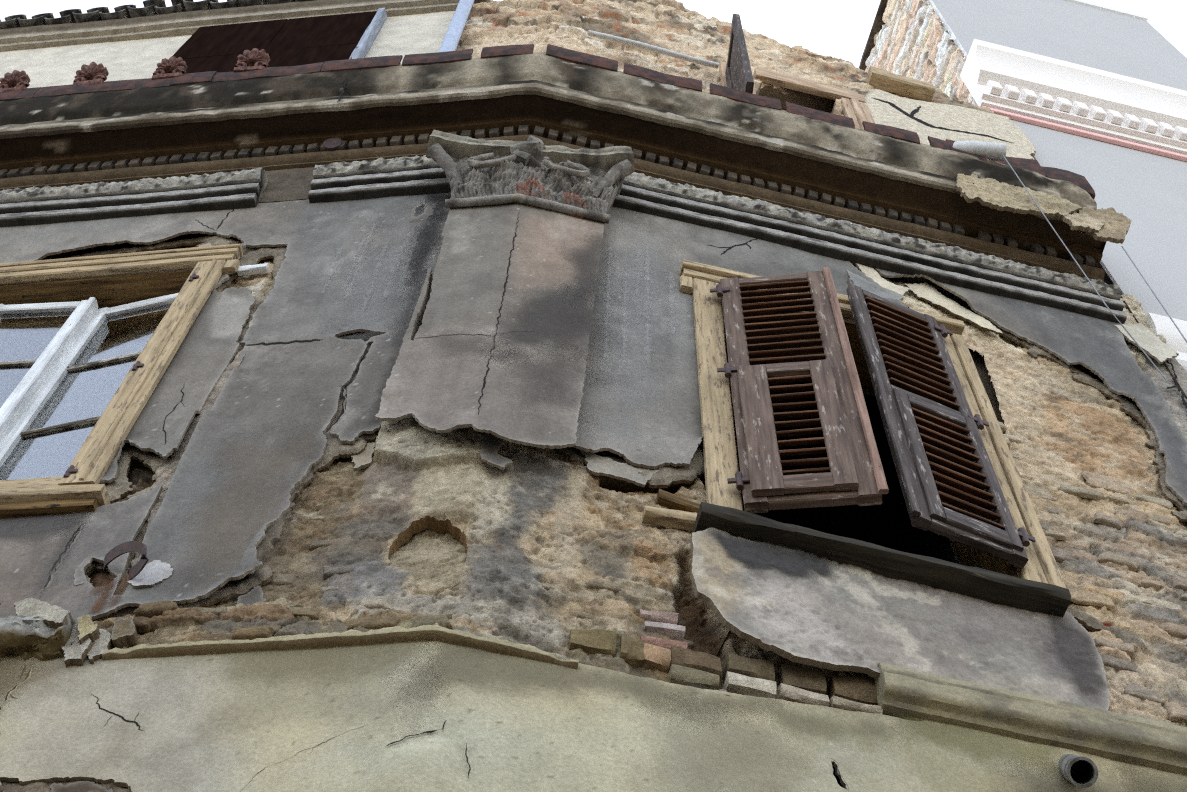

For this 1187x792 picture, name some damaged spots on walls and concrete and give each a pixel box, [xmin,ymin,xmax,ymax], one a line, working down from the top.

spalling [956,174,1132,244]
crack [419,211,520,415]
crack [163,387,186,444]
crack [241,332,385,435]
flaking render [847,263,1187,727]
flaking render [13,416,917,721]
crack [0,662,34,714]
crack [93,695,143,731]
flaking render [0,781,131,792]